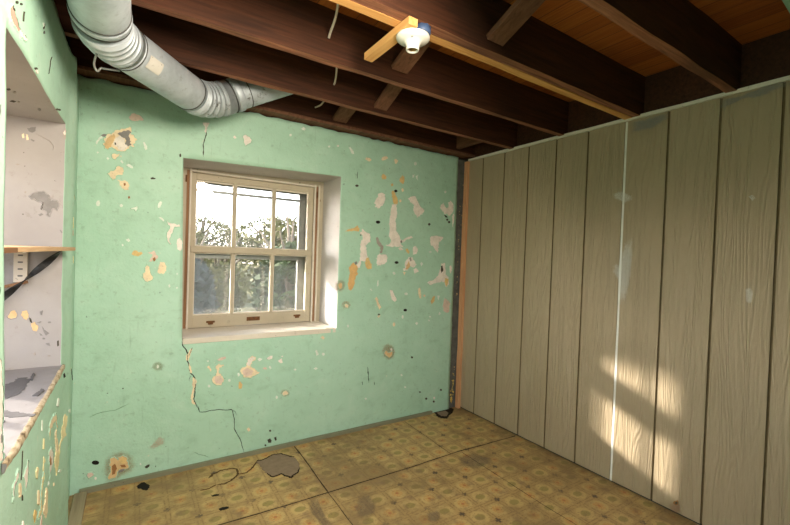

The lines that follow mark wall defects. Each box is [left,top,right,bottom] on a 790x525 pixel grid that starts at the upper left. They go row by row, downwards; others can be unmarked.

peeling [8,1,28,43]
peeling [96,113,147,212]
peeling [28,191,60,217]
peeling [335,162,425,291]
peeling [440,191,454,226]
peeling [417,262,452,321]
crack [182,343,244,451]
peeling [207,355,283,389]
peeling [0,358,71,525]
flaking render [86,452,150,482]